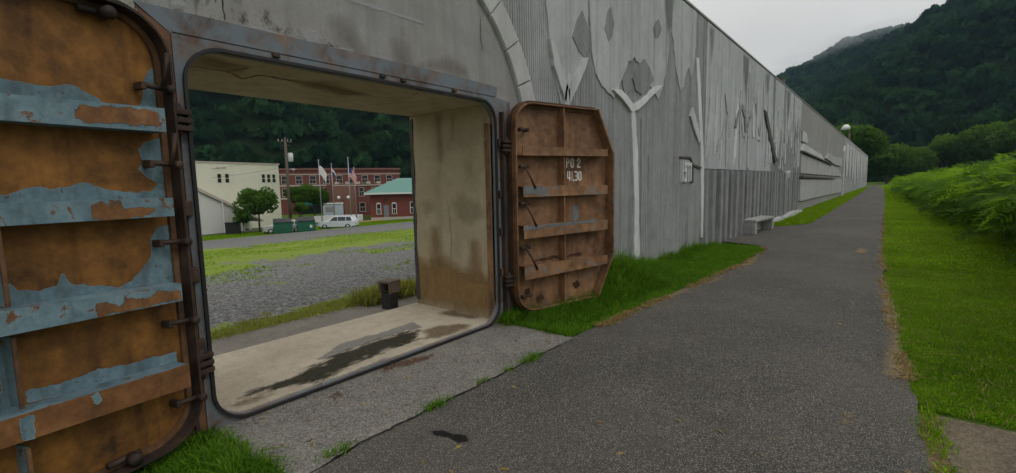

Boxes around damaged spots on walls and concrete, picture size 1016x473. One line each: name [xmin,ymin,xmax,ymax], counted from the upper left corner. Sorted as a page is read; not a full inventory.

peeling [0,78,103,103]
peeling [139,67,156,107]
peeling [0,138,165,203]
peeling [4,225,174,308]
peeling [25,351,177,404]
peeling [19,415,36,441]